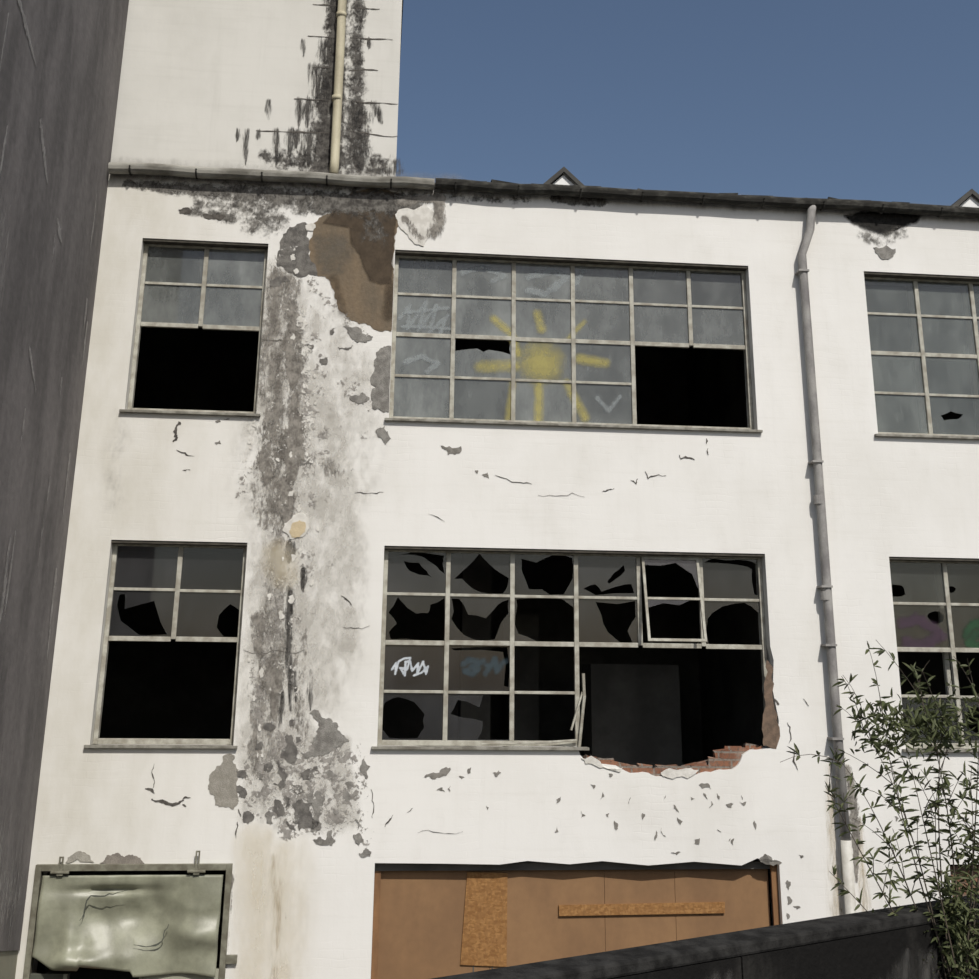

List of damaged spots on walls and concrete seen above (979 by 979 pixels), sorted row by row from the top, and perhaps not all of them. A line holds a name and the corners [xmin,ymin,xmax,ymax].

water stain [116,0,501,233]
water stain [550,195,606,207]
spalling [844,211,921,260]
crack [496,438,708,497]
water stain [248,267,339,776]
spalling [208,187,446,858]
spalling [582,661,780,808]
crack [145,767,191,807]
peeling [424,767,471,792]